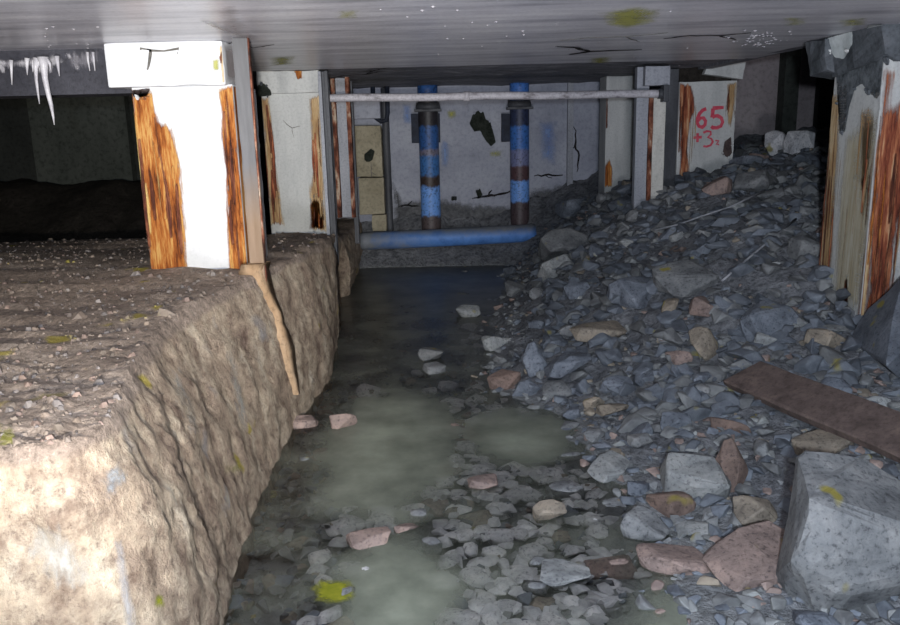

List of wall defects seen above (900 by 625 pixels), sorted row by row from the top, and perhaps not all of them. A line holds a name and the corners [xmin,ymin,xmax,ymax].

crack [557,33,748,55]
rust [132,91,187,269]
rust [219,46,250,269]
rust [247,38,283,282]
rust [309,96,326,230]
spalling [364,148,374,164]
spalling [470,109,496,146]
crack [534,126,580,178]
rust [678,84,696,176]
rust [727,82,736,124]
rust [818,73,900,316]
spalling [835,56,890,135]